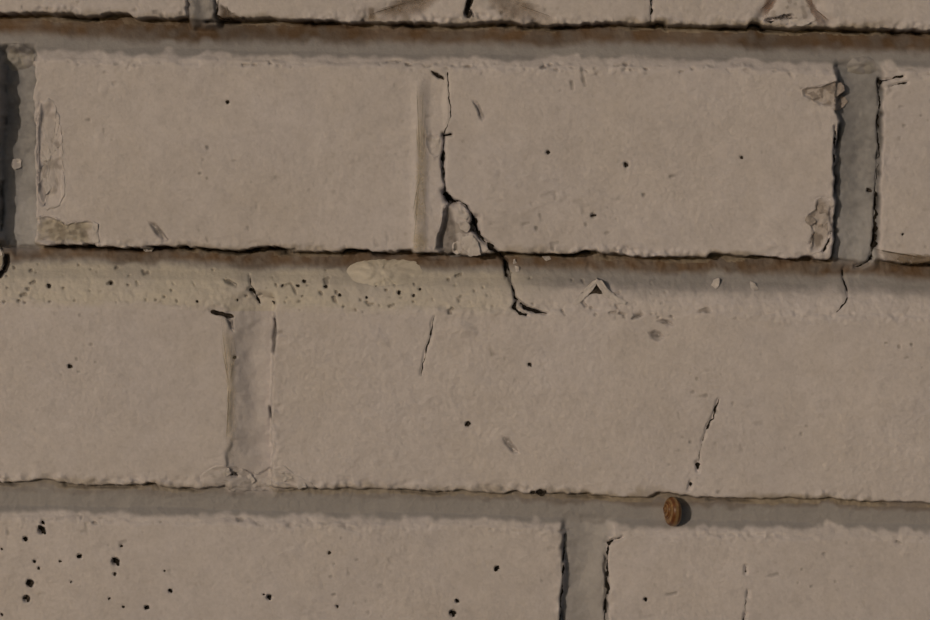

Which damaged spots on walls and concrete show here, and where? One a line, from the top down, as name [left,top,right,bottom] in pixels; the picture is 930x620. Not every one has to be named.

spalling [801,80,848,110]
spalling [35,98,99,245]
spalling [433,193,488,257]
crack [441,72,547,316]
spalling [804,197,835,255]
crack [836,75,907,312]
crack [689,399,719,486]
crack [604,538,620,620]